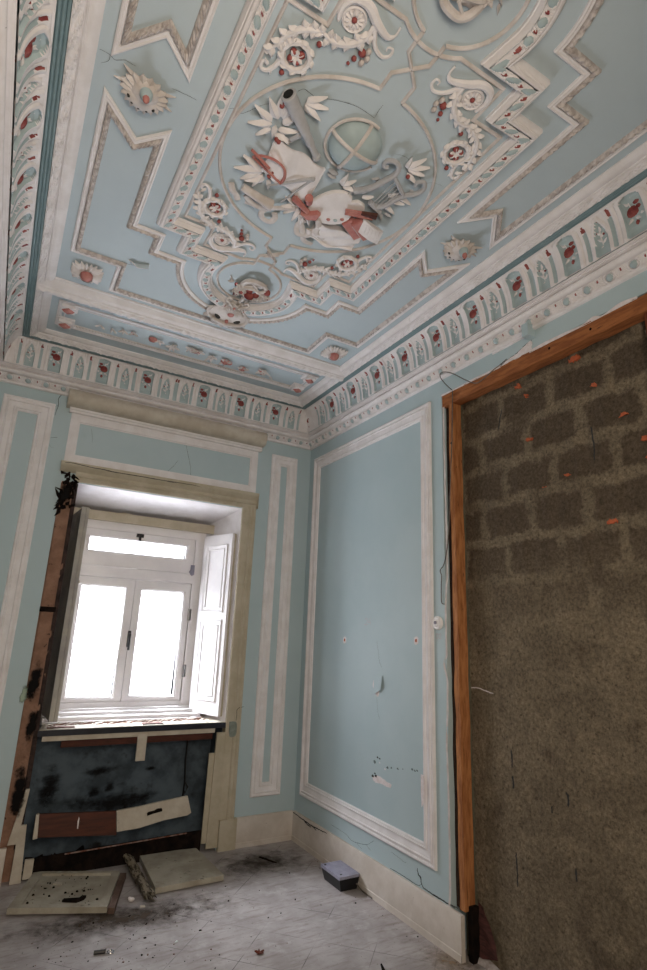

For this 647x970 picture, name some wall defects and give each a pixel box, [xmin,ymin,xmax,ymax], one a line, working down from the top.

flaking render [0,471,80,885]